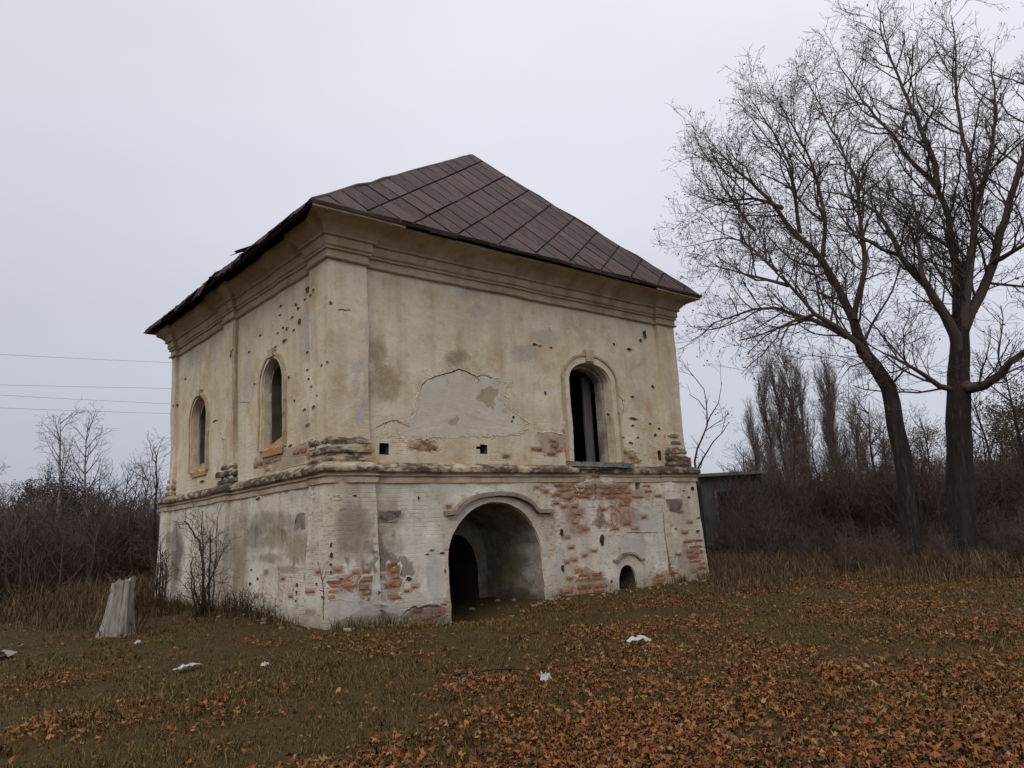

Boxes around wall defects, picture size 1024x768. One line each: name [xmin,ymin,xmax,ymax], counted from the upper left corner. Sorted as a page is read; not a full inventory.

flaking render [254,360,329,471]
crack [419,369,493,391]
peeling [380,365,566,456]
flaking render [281,541,418,610]
flaking render [535,475,662,598]
flaking render [653,511,706,585]